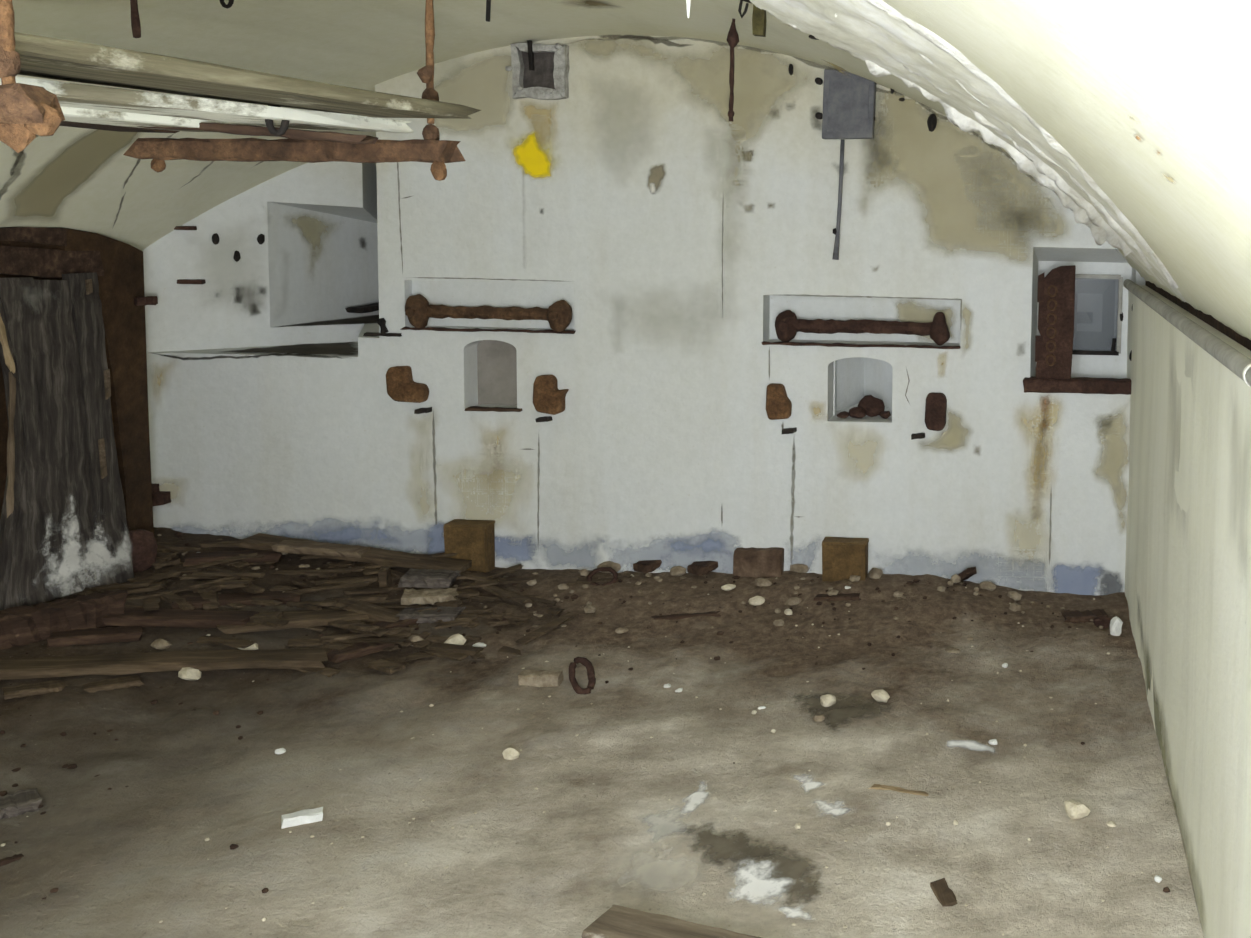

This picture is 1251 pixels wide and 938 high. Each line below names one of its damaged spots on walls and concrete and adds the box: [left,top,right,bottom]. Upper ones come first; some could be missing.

damp [676,46,796,184]
crack [0,135,38,198]
crack [113,159,140,226]
damp [869,93,1064,261]
rust [1033,398,1057,482]